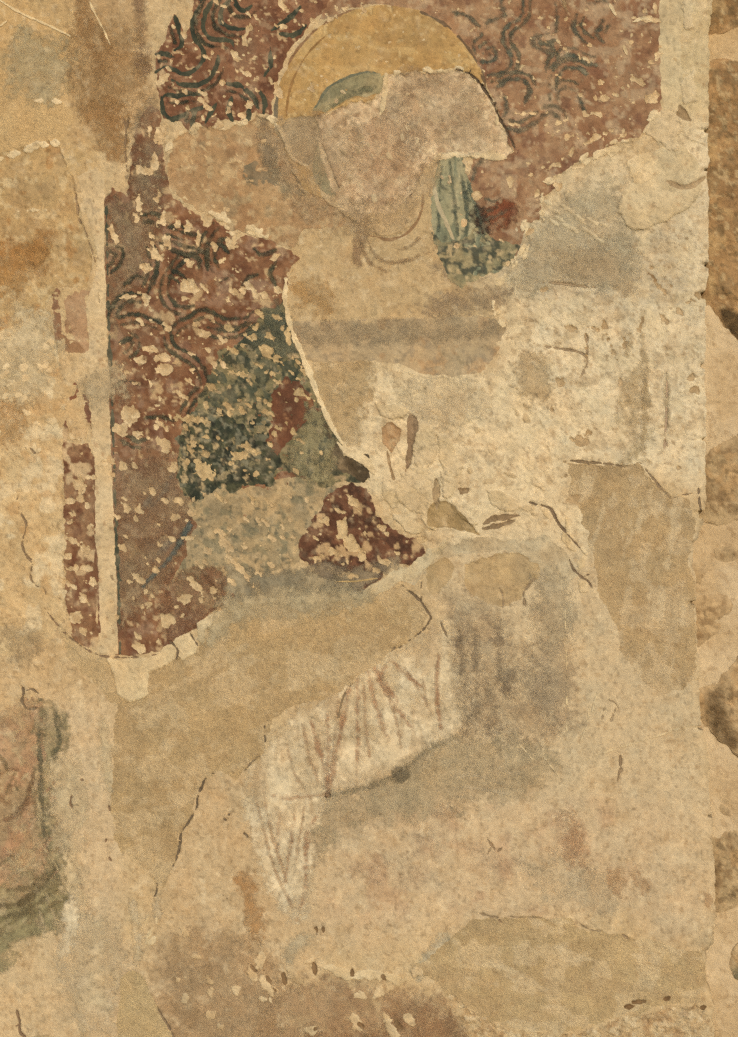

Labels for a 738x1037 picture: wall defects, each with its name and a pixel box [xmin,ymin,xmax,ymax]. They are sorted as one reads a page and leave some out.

spalling [107,0,708,702]
crack [529,501,592,588]
crack [154,773,214,896]
spalling [231,951,423,1003]
spalling [348,1013,365,1031]
spalling [382,1012,418,1037]